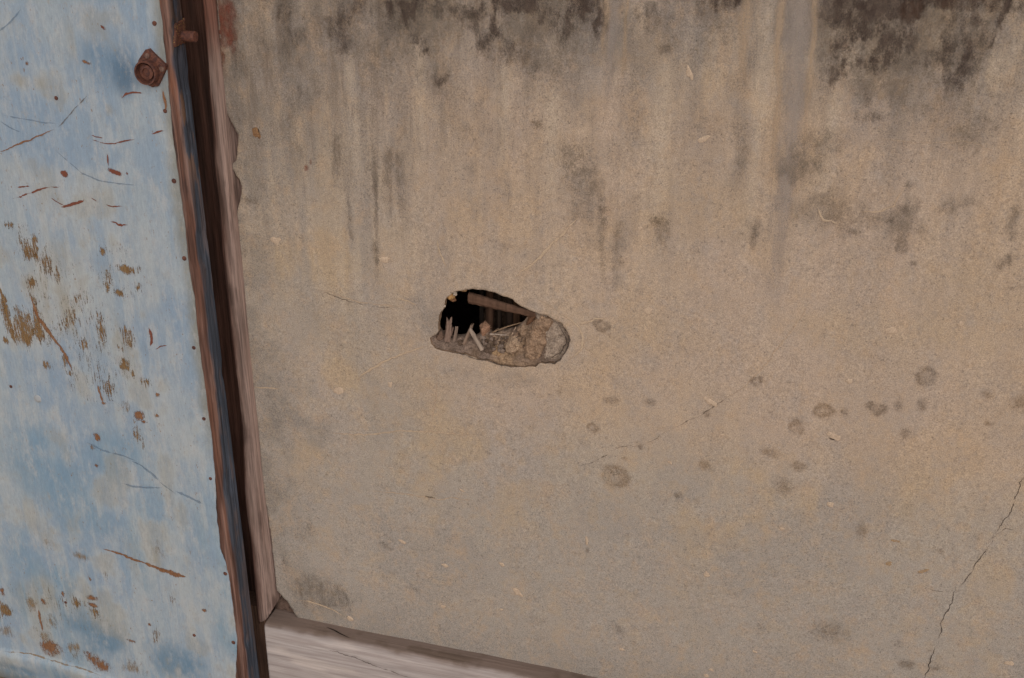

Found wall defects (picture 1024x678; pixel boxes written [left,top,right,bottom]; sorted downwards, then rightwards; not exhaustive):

leakage [772,0,948,158]
rust [0,221,159,405]
hole [431,289,571,368]
rust [126,408,159,448]
rust [0,589,13,634]
rust [11,589,108,674]
rust [104,549,185,577]
crack [924,480,1022,677]